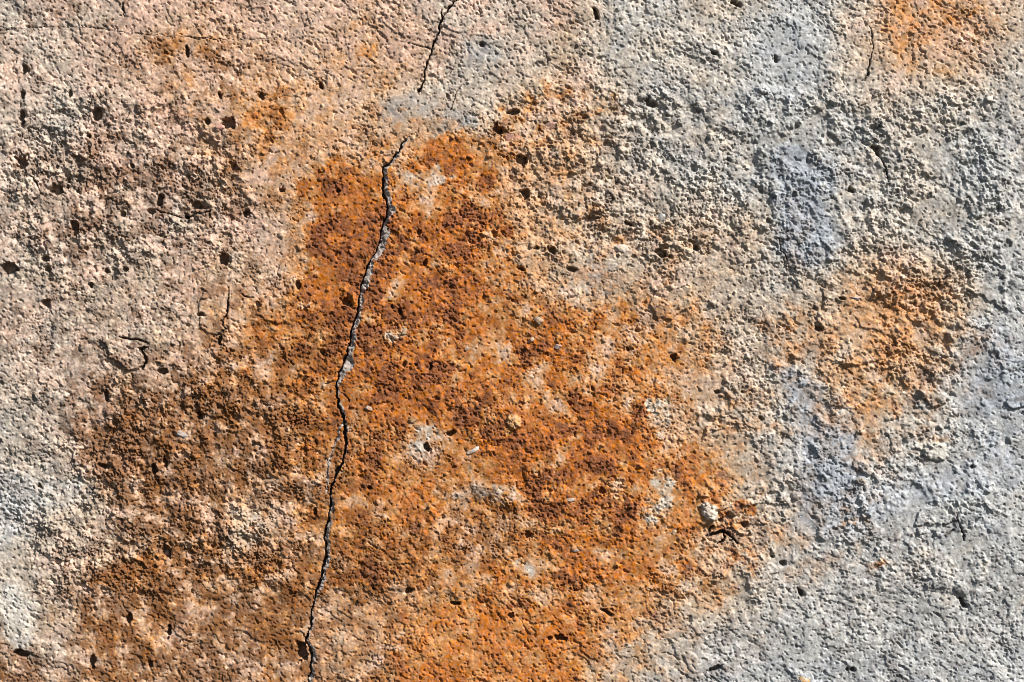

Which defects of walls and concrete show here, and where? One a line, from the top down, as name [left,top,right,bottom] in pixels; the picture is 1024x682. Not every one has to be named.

crack [401,0,458,95]
crack [306,136,411,682]
corrosion [35,0,787,682]
corrosion [669,222,1024,582]